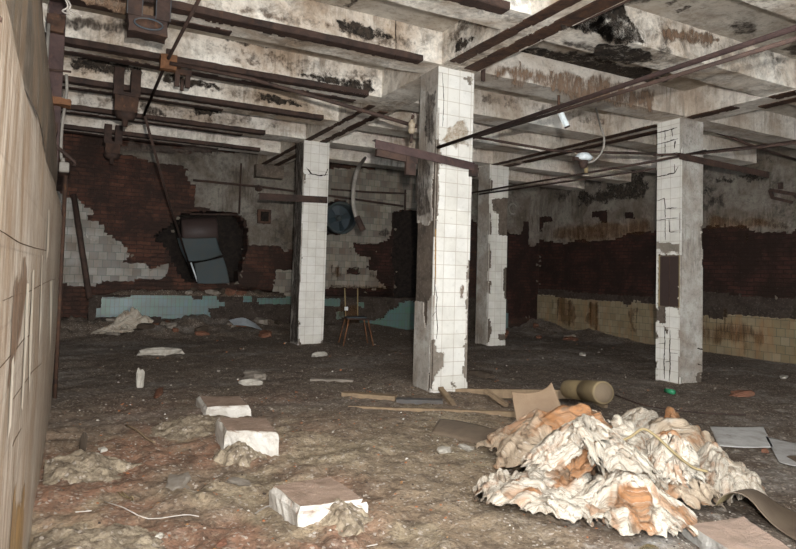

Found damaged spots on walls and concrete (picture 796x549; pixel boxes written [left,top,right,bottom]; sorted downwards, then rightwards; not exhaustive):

damp [71,57,141,74]
damp [163,73,220,91]
damp [495,4,654,112]
spalling [56,152,303,298]
spalling [416,132,444,390]
spalling [489,178,682,339]
spalling [700,224,796,320]
spalling [487,318,505,345]